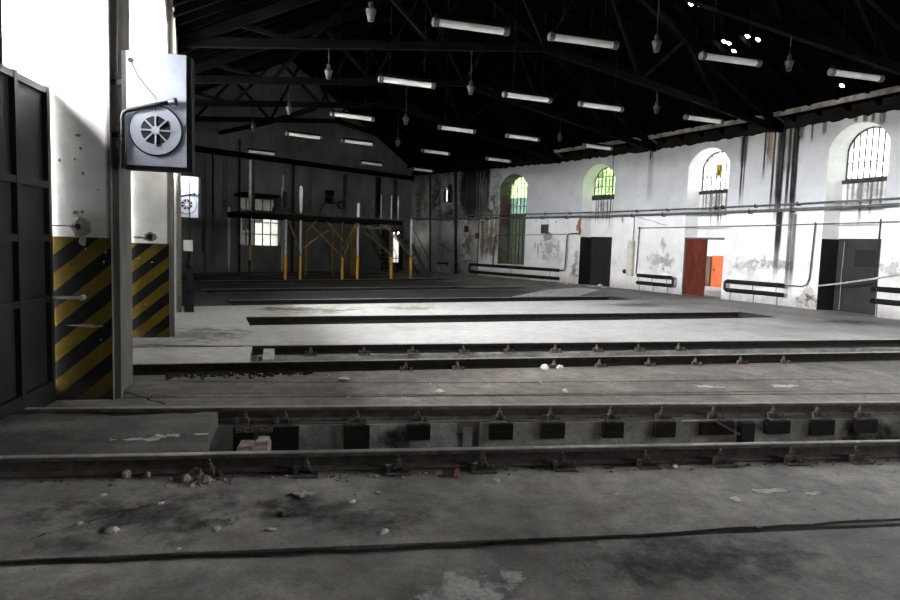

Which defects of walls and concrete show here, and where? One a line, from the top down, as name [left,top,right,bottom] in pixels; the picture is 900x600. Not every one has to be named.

water stain [416,169,499,218]
water stain [702,193,728,221]
water stain [737,122,827,281]
peeling [534,220,559,260]